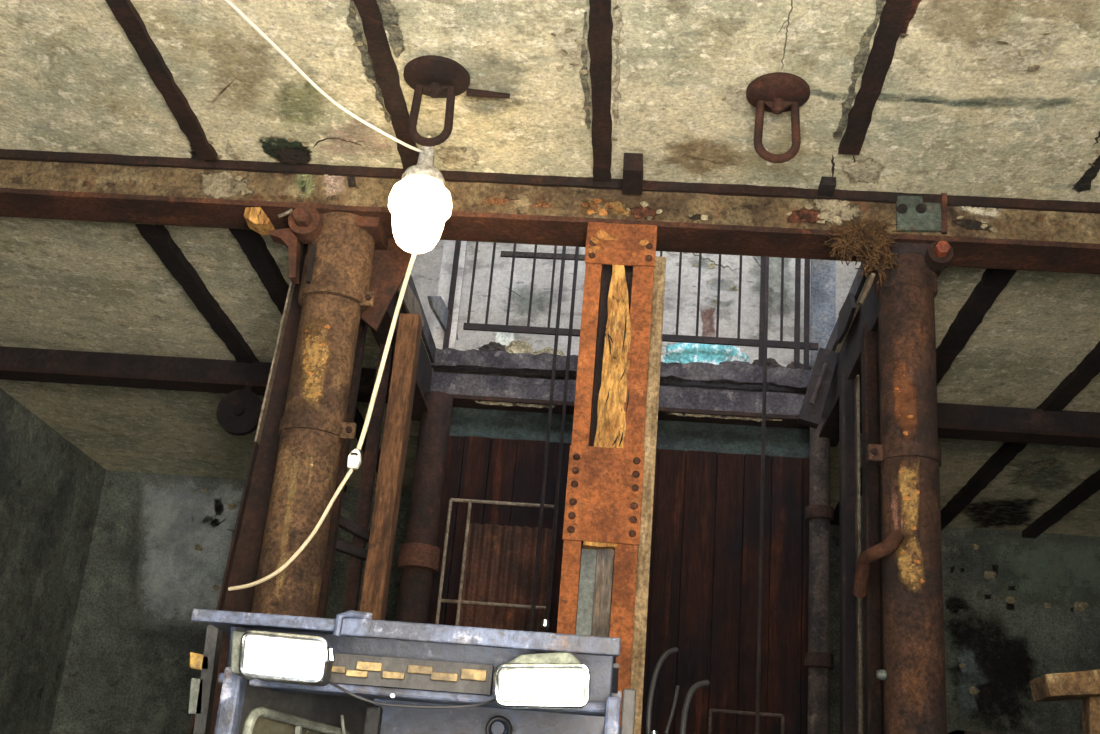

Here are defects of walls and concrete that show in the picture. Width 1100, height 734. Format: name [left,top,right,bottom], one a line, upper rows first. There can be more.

spalling [346,0,391,123]
spalling [376,0,405,58]
spalling [833,0,886,140]
corrosion [892,494,903,529]
leakage [946,597,1038,729]